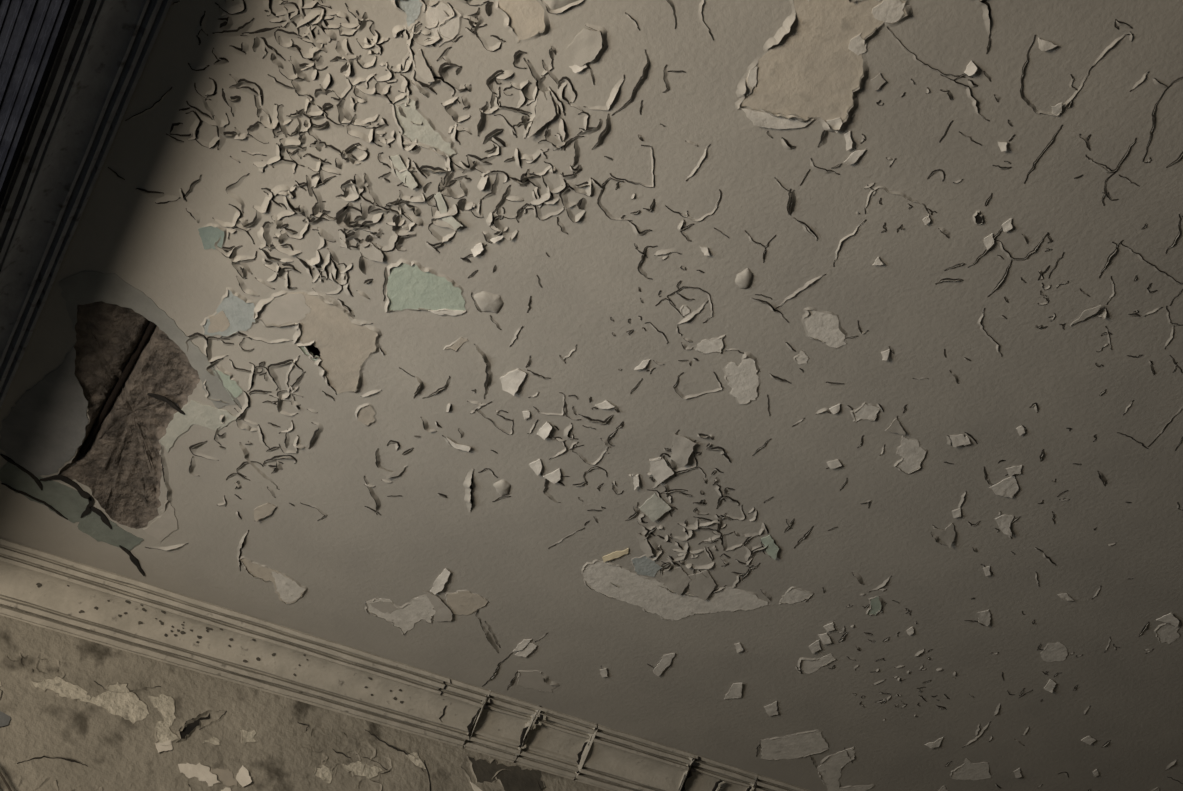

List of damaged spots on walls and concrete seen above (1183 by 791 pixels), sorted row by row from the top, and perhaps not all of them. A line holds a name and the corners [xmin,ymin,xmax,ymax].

peeling [380,92,511,229]
peeling [463,58,619,194]
peeling [735,0,913,165]
peeling [964,61,1001,102]
spalling [0,235,503,576]
peeling [626,430,696,522]
peeling [815,402,928,474]
peeling [581,513,814,621]
peeling [364,568,560,692]
peeling [7,652,227,753]
peeling [177,762,252,791]
peeling [756,729,875,791]